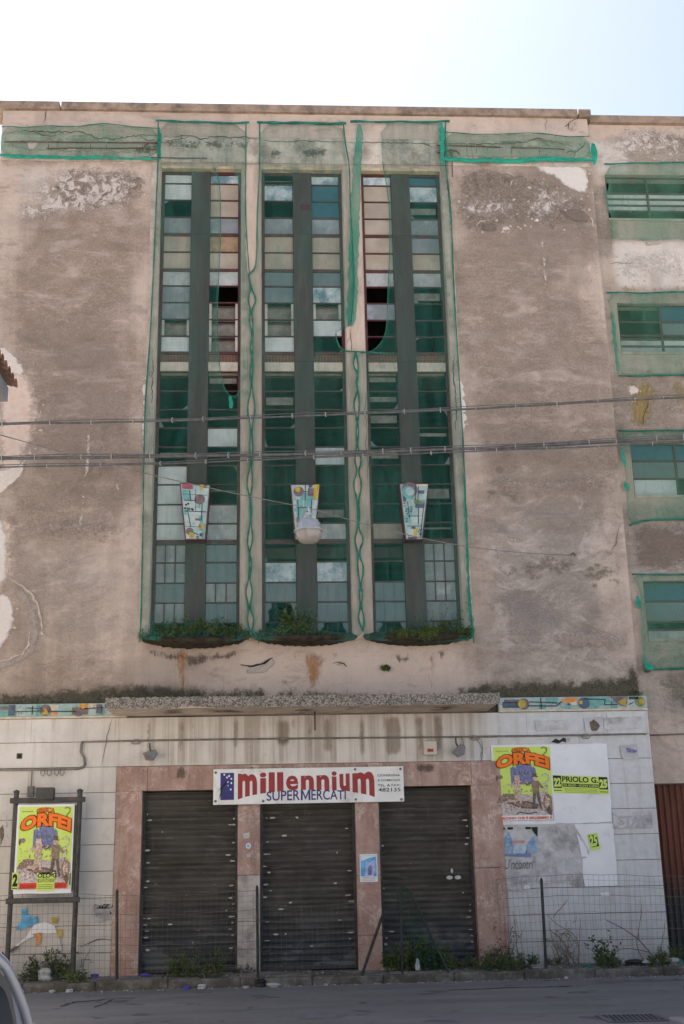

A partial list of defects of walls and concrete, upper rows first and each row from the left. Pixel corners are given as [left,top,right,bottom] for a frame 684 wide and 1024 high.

flaking render [604,126,679,161]
flaking render [4,140,248,219]
flaking render [436,145,593,233]
spalling [241,658,275,673]
rust [306,657,321,682]